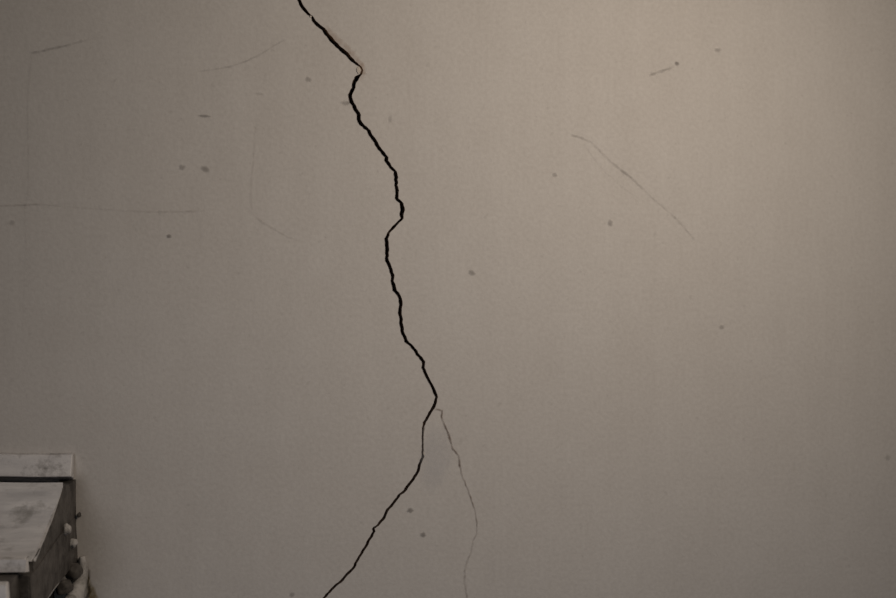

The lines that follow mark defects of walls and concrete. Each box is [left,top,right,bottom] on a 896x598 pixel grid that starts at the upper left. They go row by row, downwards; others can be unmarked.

crack [298,0,450,598]